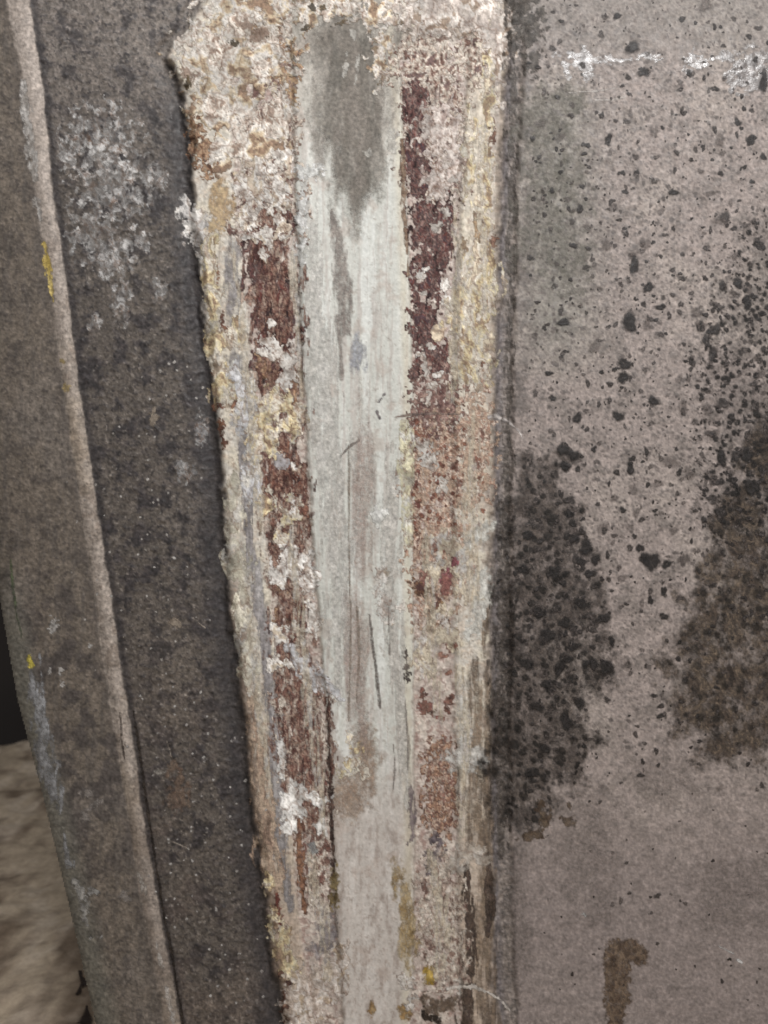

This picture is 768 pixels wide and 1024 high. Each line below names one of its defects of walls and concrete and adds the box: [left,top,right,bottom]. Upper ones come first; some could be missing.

rust [183,22,376,963]
peeling [277,738,334,837]
peeling [262,871,354,1024]
water stain [289,0,410,706]
peeling [158,0,574,702]
spalling [396,972,460,1024]
rust [402,649,455,721]
rust [384,22,502,639]
rust [437,641,458,676]
water stain [427,0,663,1024]
water stain [655,212,768,764]
water stain [682,44,768,96]